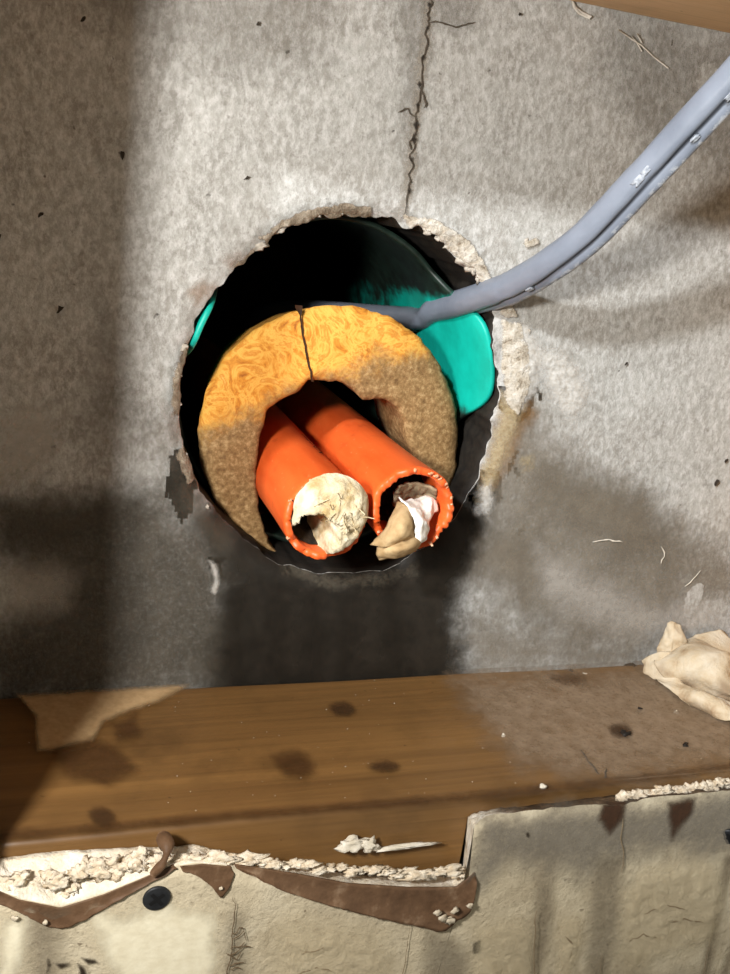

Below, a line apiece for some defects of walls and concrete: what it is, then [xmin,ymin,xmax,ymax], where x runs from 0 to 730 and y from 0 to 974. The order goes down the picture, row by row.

crack [398,0,475,218]
spalling [334,834,441,853]
water stain [480,797,730,876]
peeling [0,920,26,974]
water stain [48,959,96,974]